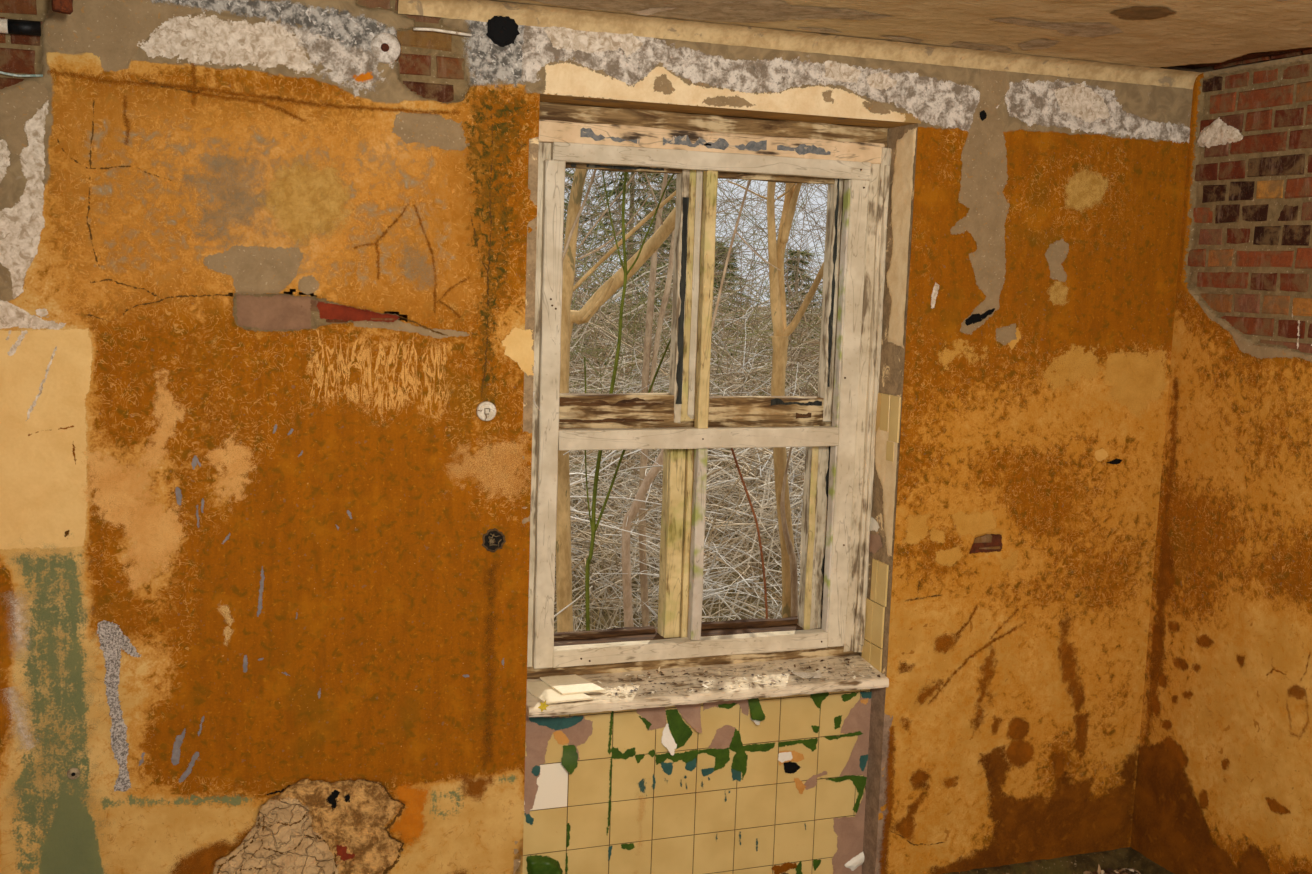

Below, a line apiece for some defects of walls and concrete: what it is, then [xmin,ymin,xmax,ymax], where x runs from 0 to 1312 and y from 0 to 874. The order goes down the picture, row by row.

crack [57,100,233,321]
peeling [0,0,470,330]
spalling [203,245,460,426]
crack [353,108,494,395]
peeling [502,327,534,381]
flaking render [520,26,1312,387]
peeling [97,620,142,792]
peeling [526,823,571,874]
peeling [524,715,593,825]
peeling [607,691,872,874]
damp [878,679,959,874]
damp [927,376,1312,874]